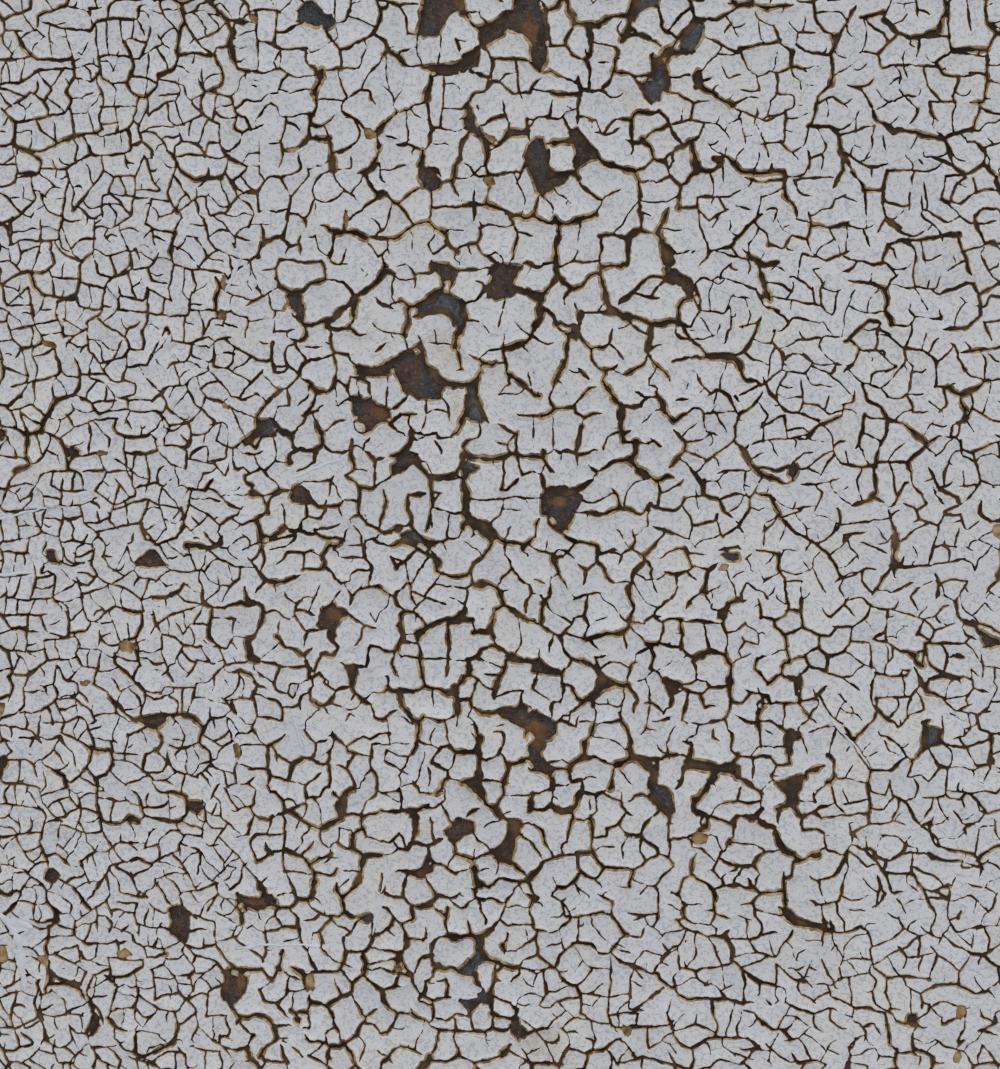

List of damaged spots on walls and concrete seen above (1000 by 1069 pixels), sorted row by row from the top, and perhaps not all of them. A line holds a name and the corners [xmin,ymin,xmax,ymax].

crack [270,116,300,164]
peeling [204,0,764,586]
peeling [317,603,348,638]
crack [924,567,1000,648]
peeling [89,612,970,1069]
crack [73,828,240,957]
crack [863,875,886,907]
crack [883,913,930,970]
crack [92,1046,127,1069]
crack [378,1037,422,1069]
crack [741,997,841,1069]
crack [844,1021,880,1069]